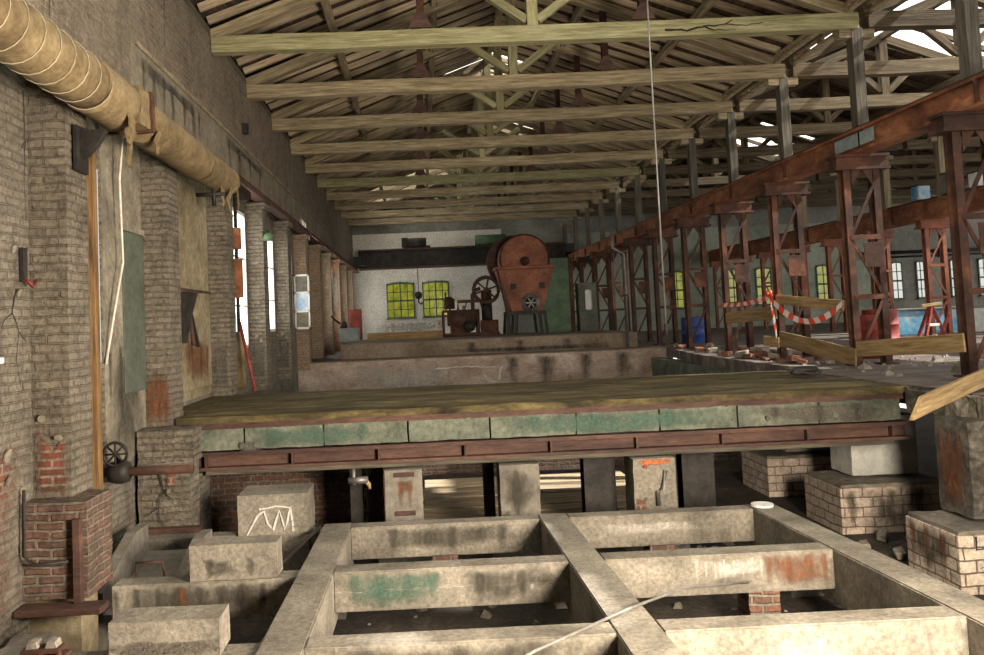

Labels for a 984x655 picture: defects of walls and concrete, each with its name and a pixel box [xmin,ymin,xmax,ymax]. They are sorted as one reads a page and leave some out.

damp [471,339,590,374]
peeling [0,449,13,510]
peeling [39,434,66,492]
damp [337,573,552,595]